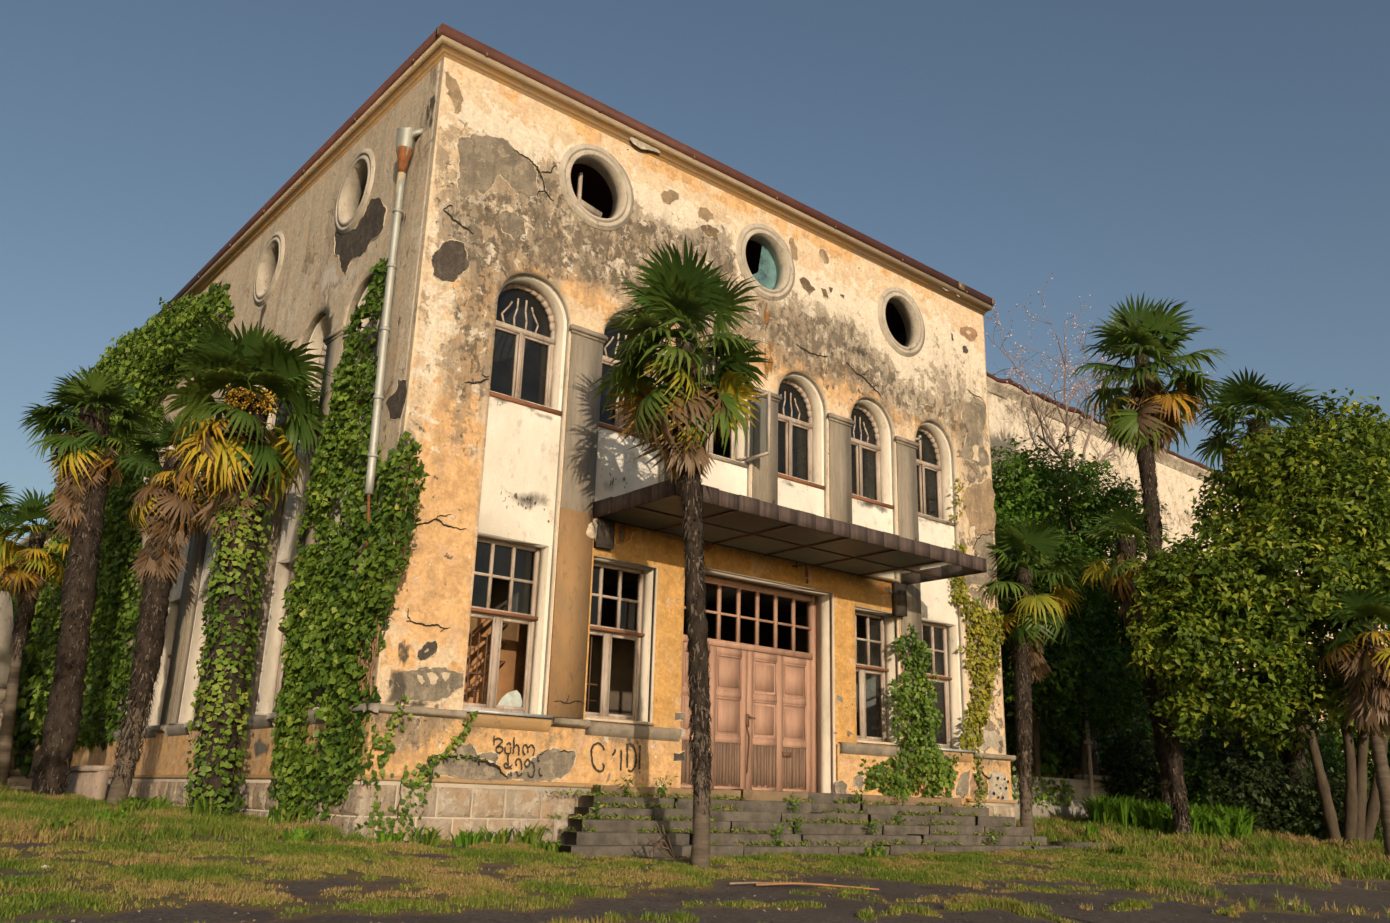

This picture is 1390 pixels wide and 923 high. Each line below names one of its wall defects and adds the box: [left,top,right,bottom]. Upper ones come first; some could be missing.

spalling [456,133,539,239]
spalling [661,189,679,205]
spalling [334,197,387,275]
spalling [697,207,720,239]
flaking render [789,237,845,299]
flaking render [951,326,978,354]
spalling [386,379,407,421]
crack [413,514,466,530]
flaking render [398,640,464,703]